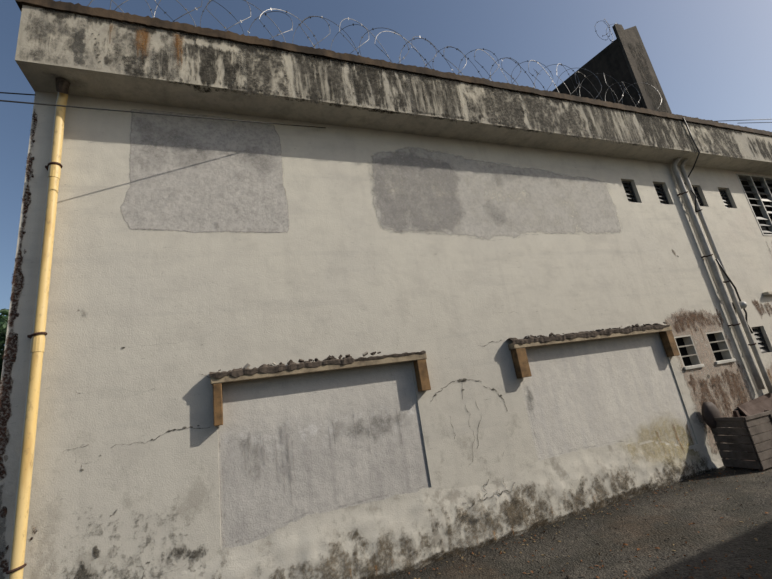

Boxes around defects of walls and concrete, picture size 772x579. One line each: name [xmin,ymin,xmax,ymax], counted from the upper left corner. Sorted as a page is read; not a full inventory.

water stain [27,8,772,160]
water stain [373,154,462,231]
spalling [0,111,37,579]
crack [434,378,507,465]
peeling [507,310,752,453]
crack [461,478,515,524]
water stain [301,426,716,579]
water stain [74,557,142,579]
water stain [162,546,206,568]